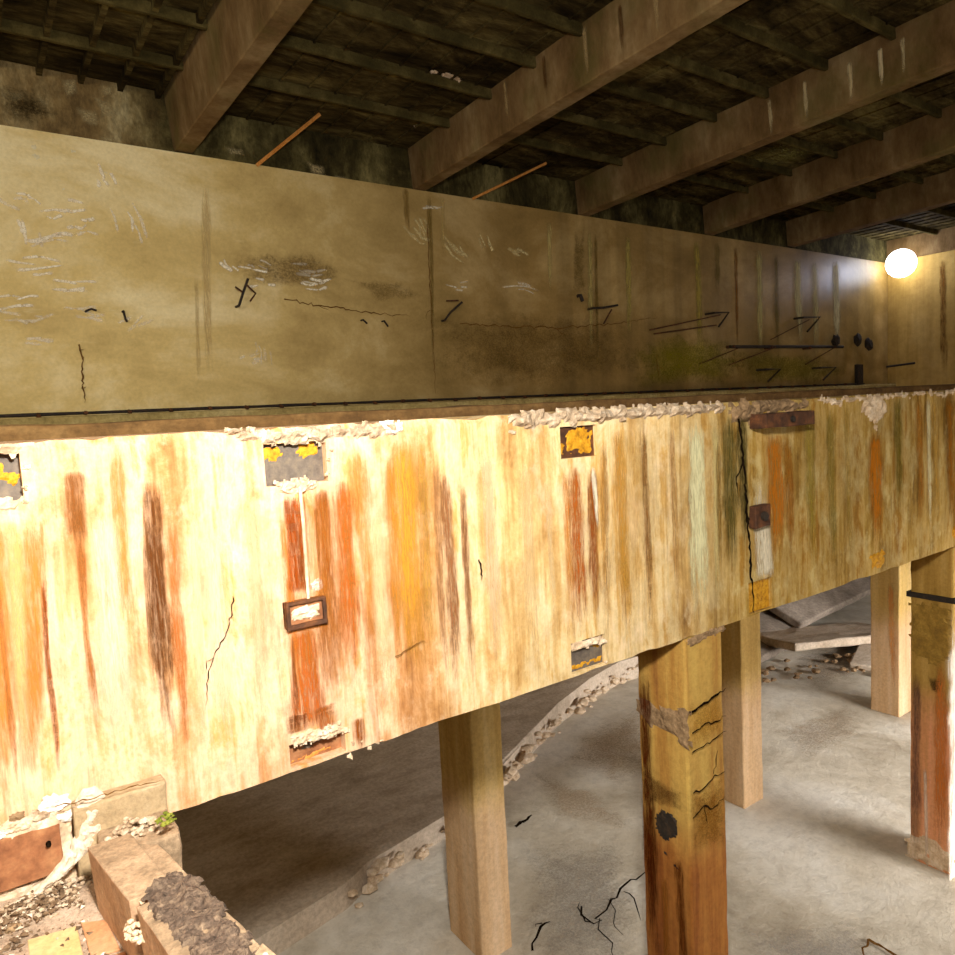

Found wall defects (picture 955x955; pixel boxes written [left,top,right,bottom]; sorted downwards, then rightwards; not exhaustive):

crack [284,298,400,316]
crack [78,344,86,401]
spalling [0,442,35,511]
spalling [224,419,403,495]
rust [281,498,306,602]
rust [387,450,431,654]
rust [289,457,373,732]
rust [0,529,59,753]
rust [355,719,364,744]
crack [689,688,726,821]
crack [531,921,550,951]
crack [577,872,645,955]